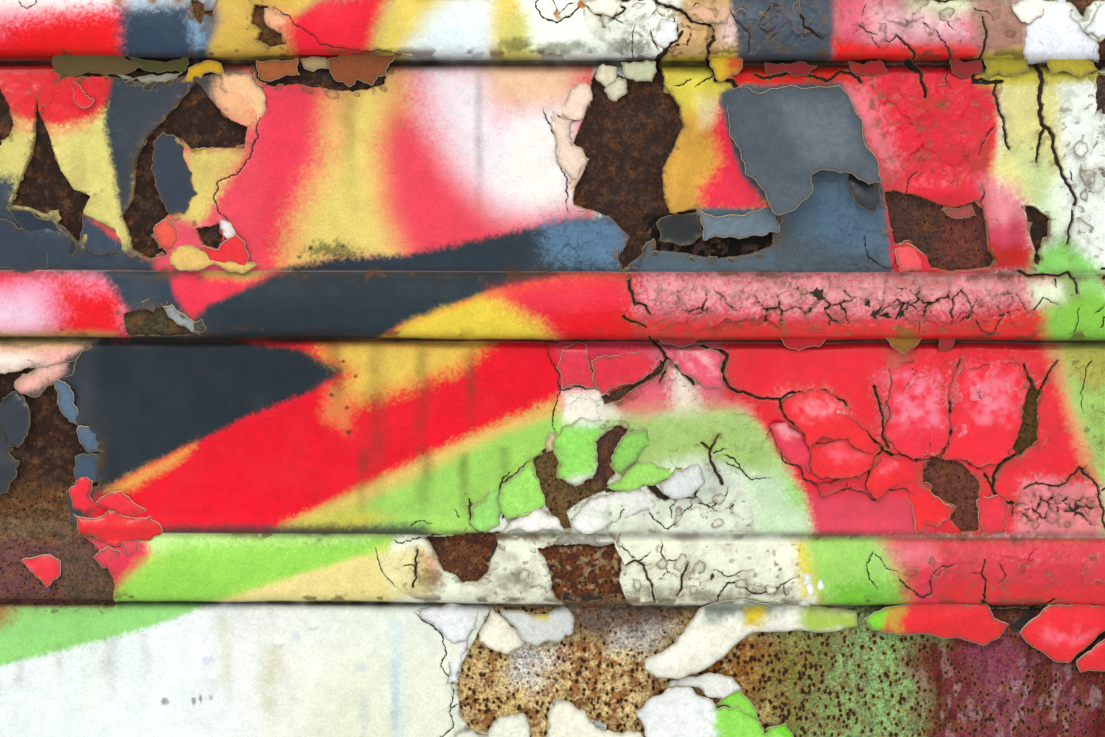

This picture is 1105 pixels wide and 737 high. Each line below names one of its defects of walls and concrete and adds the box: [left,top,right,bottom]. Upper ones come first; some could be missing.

peeling [0,0,395,274]
crack [535,0,884,138]
peeling [550,55,995,281]
crack [851,0,1016,154]
peeling [949,0,1105,122]
crack [1032,64,1095,244]
crack [622,236,1105,423]
peeling [0,338,163,614]
crack [563,385,951,601]
peeling [417,417,1105,737]
peeling [769,338,1042,541]
crack [866,454,1105,632]